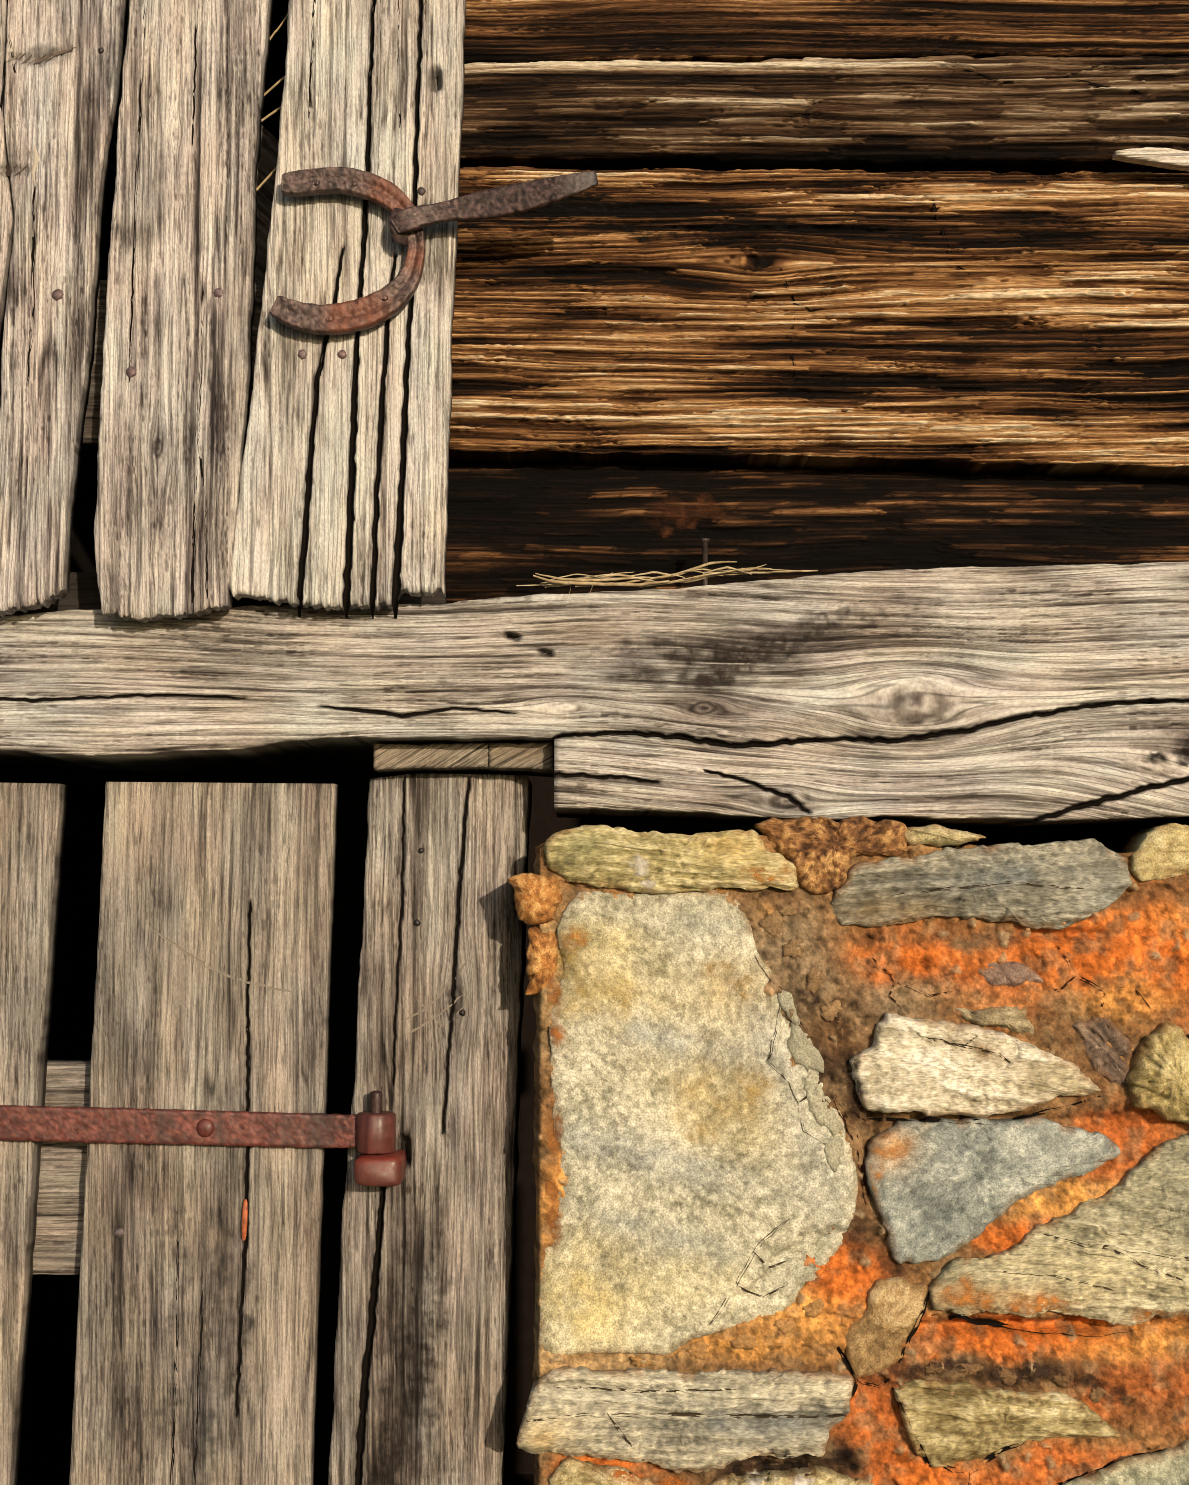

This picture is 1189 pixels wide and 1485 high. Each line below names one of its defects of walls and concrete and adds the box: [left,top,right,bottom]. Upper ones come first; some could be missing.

crack [297,0,422,619]
crack [0,693,246,703]
crack [319,706,516,718]
crack [555,699,1189,813]
crack [1035,777,1189,845]
crack [244,903,252,1111]
crack [442,779,470,1134]
crack [170,1212,203,1485]
crack [235,1146,249,1417]
crack [355,1186,385,1485]